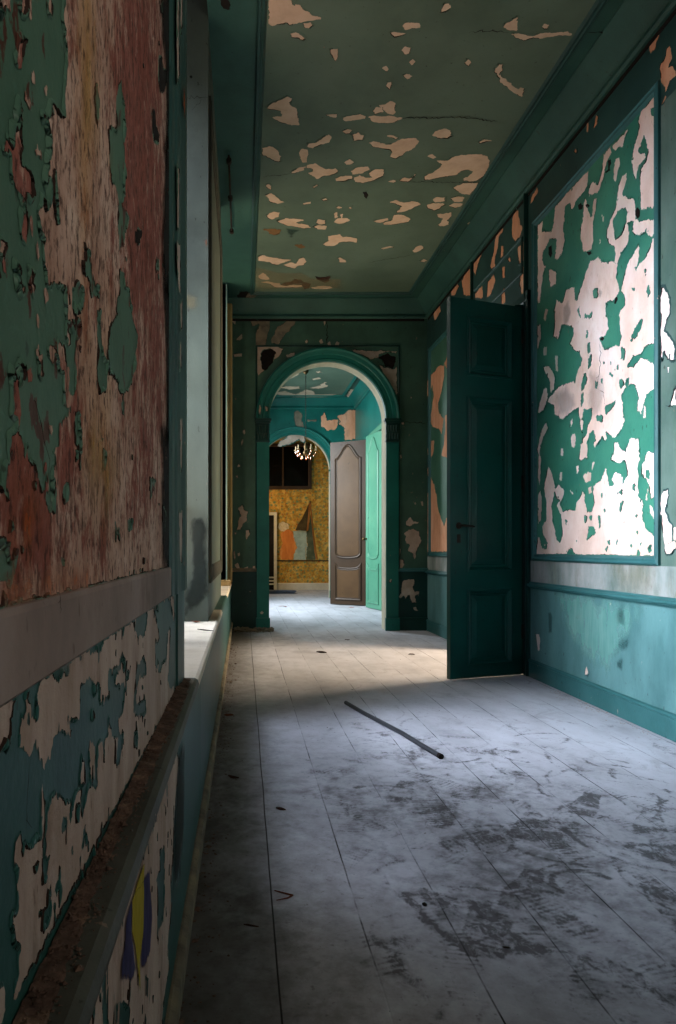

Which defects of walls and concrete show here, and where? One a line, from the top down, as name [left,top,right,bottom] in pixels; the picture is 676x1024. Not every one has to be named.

peeling [267,0,321,41]
peeling [492,63,527,97]
peeling [502,15,572,42]
peeling [261,21,492,263]
peeling [0,0,183,609]
peeling [256,244,334,289]
peeling [451,186,538,304]
peeling [536,34,676,556]
peeling [277,371,355,447]
peeling [351,348,398,395]
peeling [389,357,447,611]
peeling [0,596,180,1024]